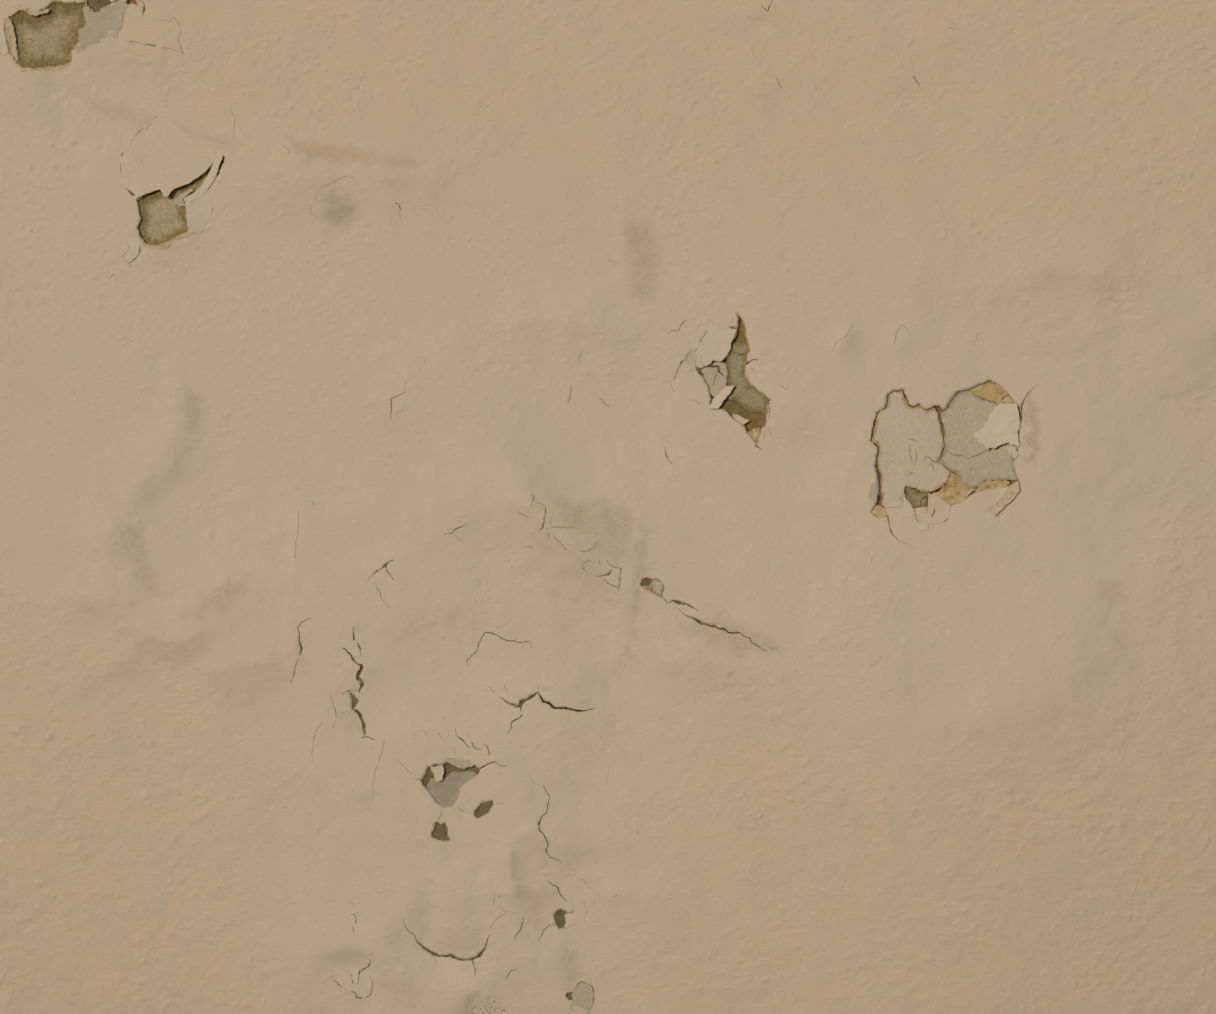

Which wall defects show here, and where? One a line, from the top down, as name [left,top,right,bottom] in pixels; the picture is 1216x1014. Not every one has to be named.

peeling [0,0,182,72]
peeling [120,116,224,268]
peeling [671,312,771,450]
peeling [869,379,1038,544]
crack [518,494,622,590]
crack [467,632,532,664]
crack [679,609,780,653]
crack [419,684,595,754]
peeling [396,747,503,842]
crack [533,781,617,904]
crack [403,895,524,976]